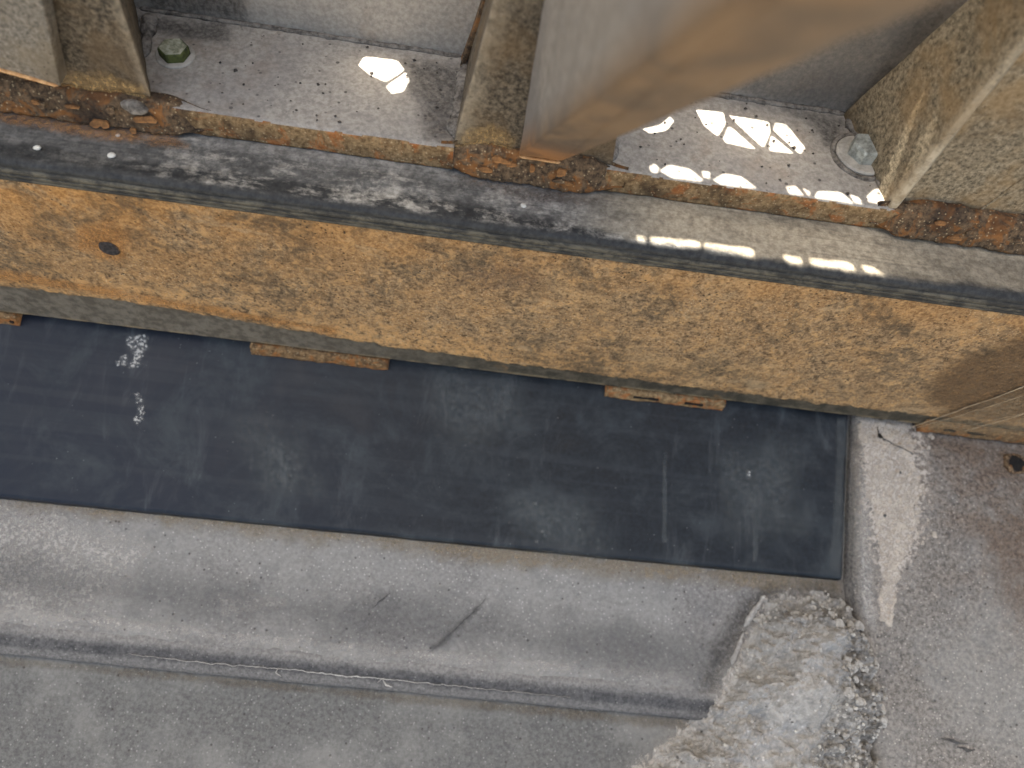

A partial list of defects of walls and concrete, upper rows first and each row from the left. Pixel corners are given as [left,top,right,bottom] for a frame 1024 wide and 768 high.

corrosion [0,72,213,136]
corrosion [440,130,629,193]
corrosion [869,198,1024,255]
spalling [631,587,888,768]